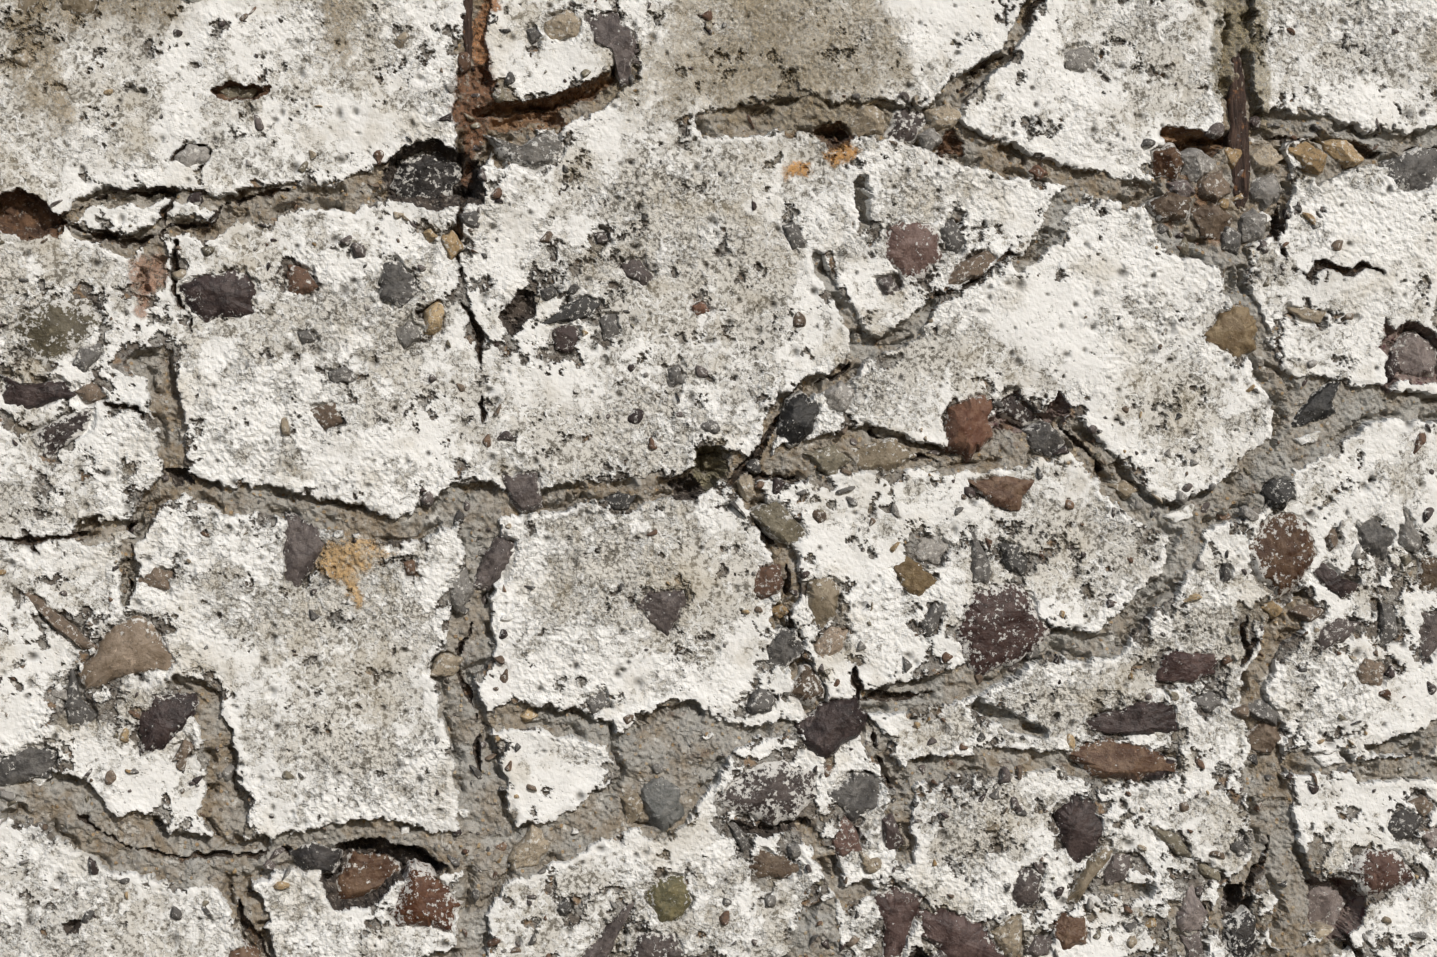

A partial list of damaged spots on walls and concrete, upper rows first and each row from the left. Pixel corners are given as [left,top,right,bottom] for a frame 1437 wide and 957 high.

rust [452,0,502,185]
crack [61,144,290,332]
crack [416,194,487,422]
crack [1267,203,1384,282]
crack [0,530,88,552]
crack [725,359,850,660]
spalling [690,0,1437,866]
spalling [0,345,826,957]
crack [850,666,933,790]
spalling [1164,590,1437,957]
spalling [781,821,882,957]
spalling [1093,878,1151,902]